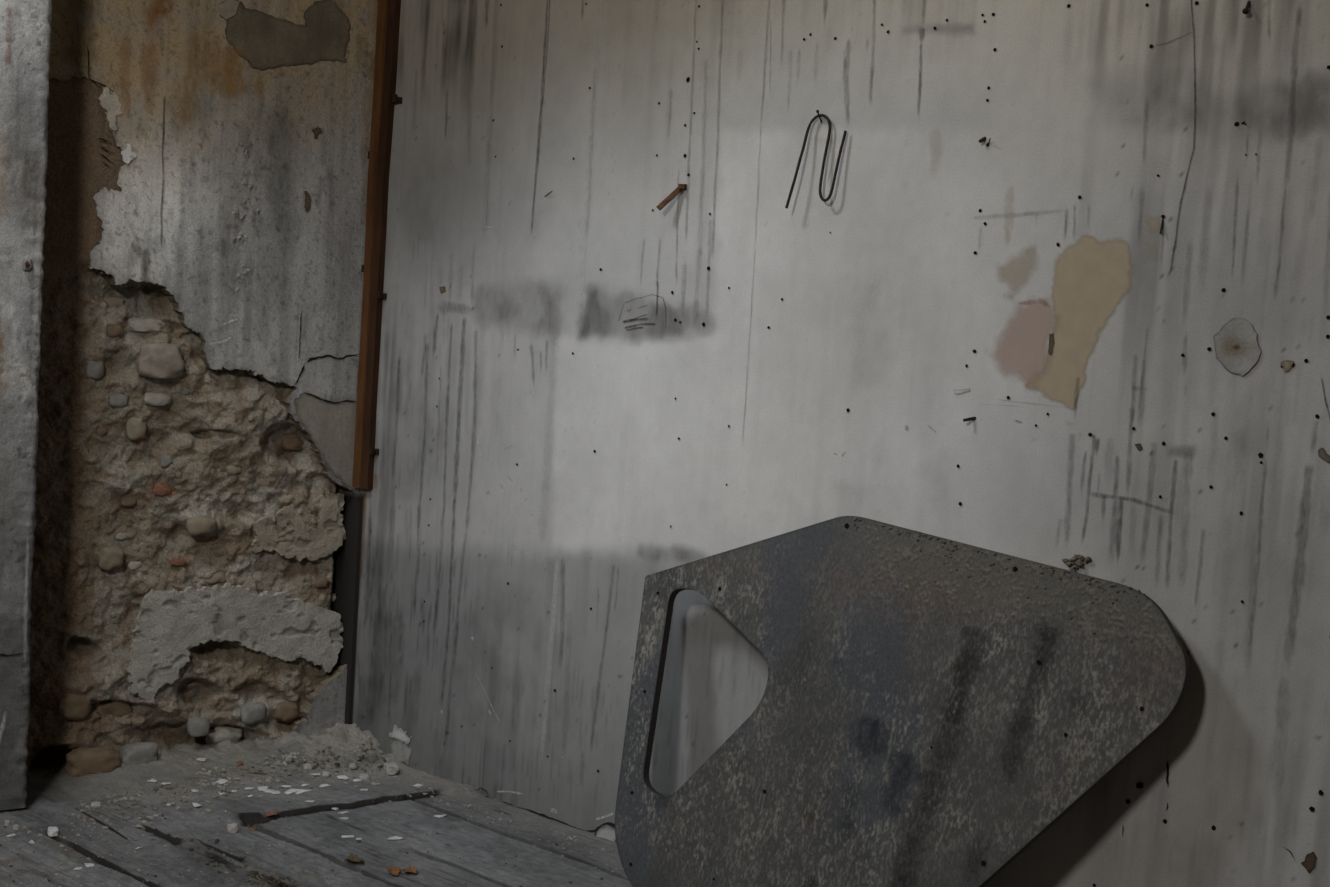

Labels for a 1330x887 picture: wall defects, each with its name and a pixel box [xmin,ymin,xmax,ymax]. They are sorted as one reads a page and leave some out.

peeling [219,0,350,70]
crack [1172,0,1196,260]
spalling [22,76,357,777]
peeling [1026,236,1132,409]